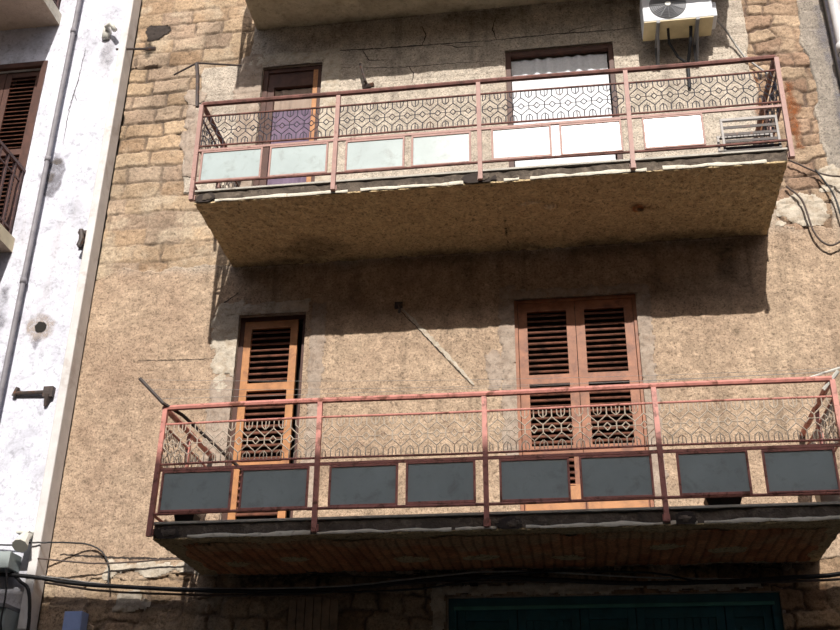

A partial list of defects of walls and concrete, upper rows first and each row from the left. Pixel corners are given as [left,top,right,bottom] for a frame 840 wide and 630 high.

crack [340,18,636,80]